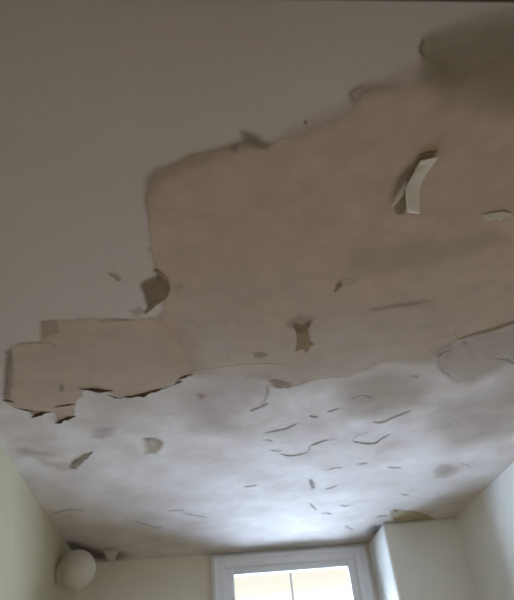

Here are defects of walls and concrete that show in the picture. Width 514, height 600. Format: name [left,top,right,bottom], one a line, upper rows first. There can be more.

peeling [391,156,439,214]
peeling [294,322,314,352]
peeling [3,319,193,424]
peeling [270,380,290,389]
peeling [70,452,93,469]
spalling [377,510,433,522]